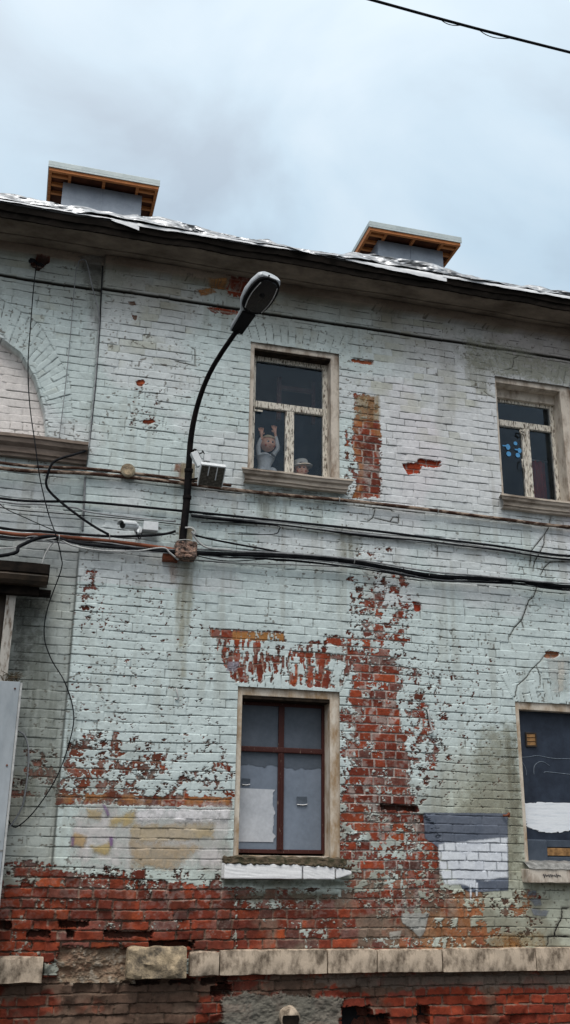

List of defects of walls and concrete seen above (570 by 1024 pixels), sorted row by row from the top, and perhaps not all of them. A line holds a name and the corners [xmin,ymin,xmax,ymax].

spalling [131,380,162,435]
peeling [344,393,382,499]
spalling [402,459,441,475]
crack [509,518,562,637]
peeling [0,547,542,964]